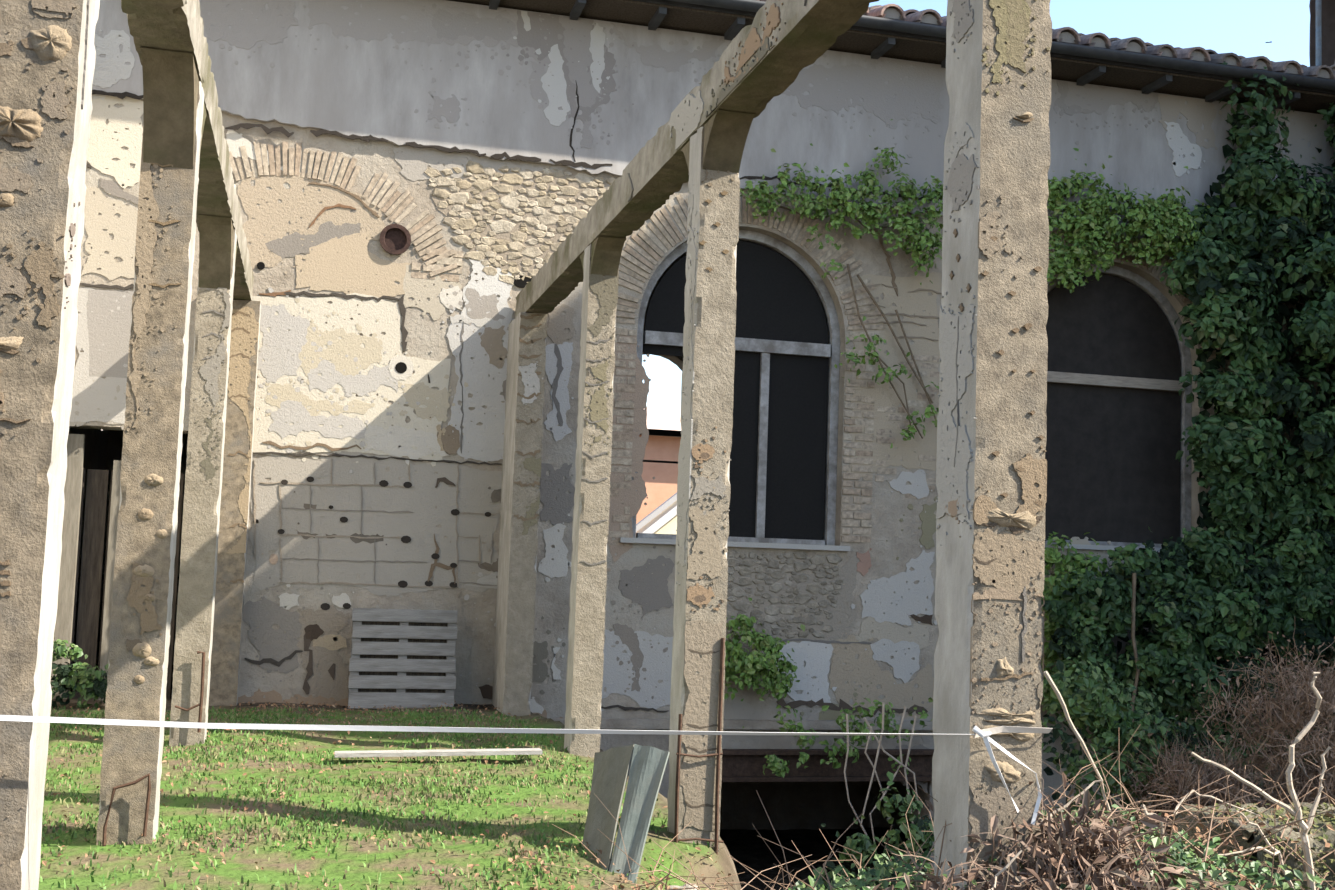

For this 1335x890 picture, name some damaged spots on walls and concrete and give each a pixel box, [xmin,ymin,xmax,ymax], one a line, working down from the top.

crack [225,80,634,202]
peeling [1158,94,1222,177]
flaking render [226,129,616,706]
spalling [601,335,937,855]